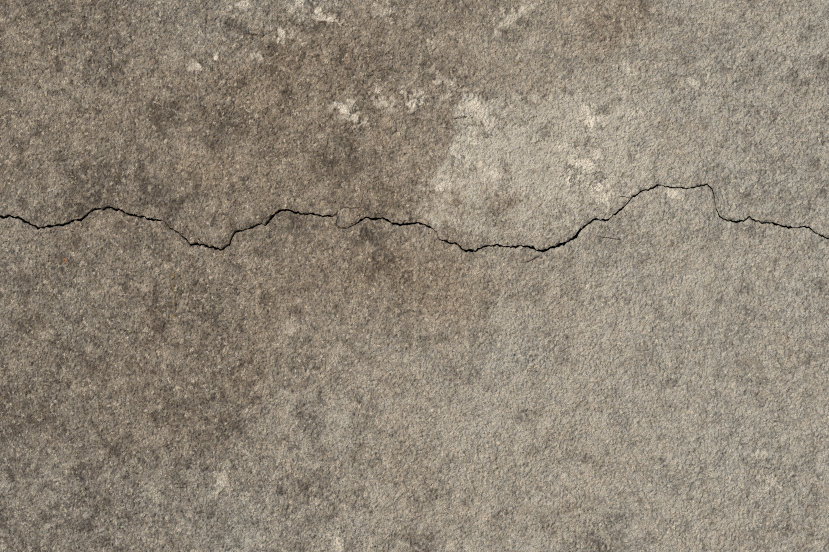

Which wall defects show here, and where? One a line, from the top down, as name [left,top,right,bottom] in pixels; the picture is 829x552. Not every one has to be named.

crack [0,184,829,263]